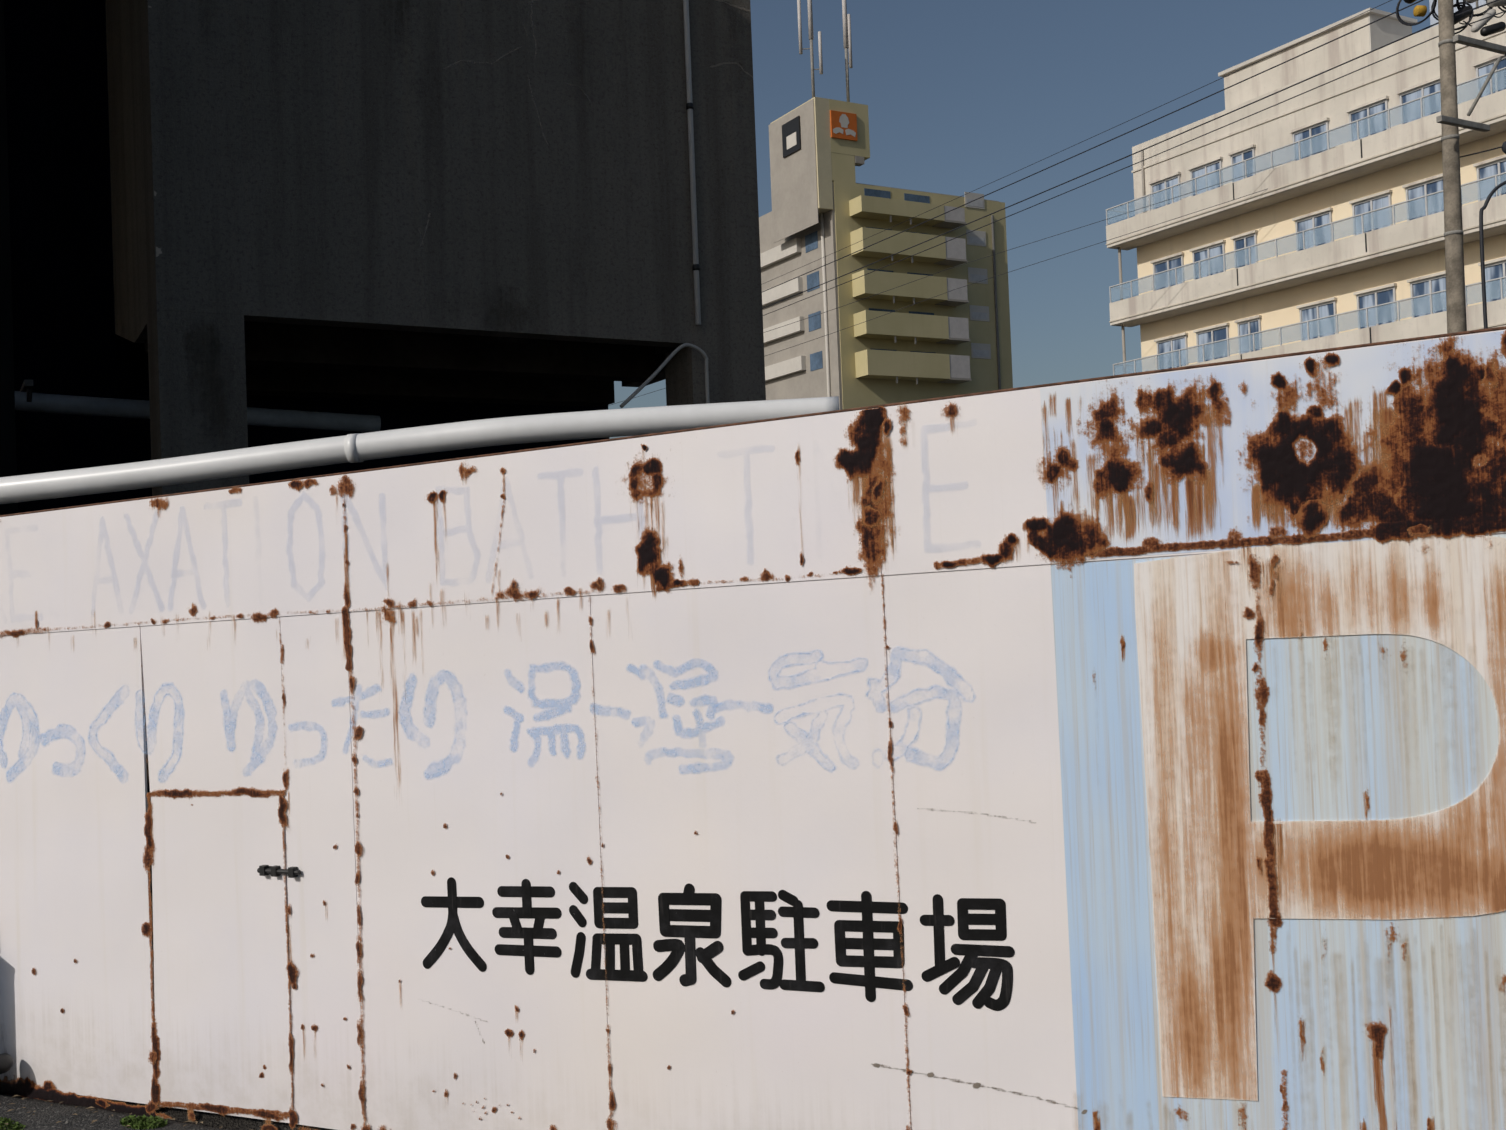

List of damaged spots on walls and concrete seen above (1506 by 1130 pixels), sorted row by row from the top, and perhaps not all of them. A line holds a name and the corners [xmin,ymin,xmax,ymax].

rust [149,498,168,514]
rust [288,479,318,491]
rust [427,490,446,555]
rust [459,462,476,479]
rust [491,468,506,593]
rust [624,444,700,596]
rust [934,330,1506,655]
rust [379,606,415,653]
rust [1154,571,1506,1130]
rust [0,787,318,1130]